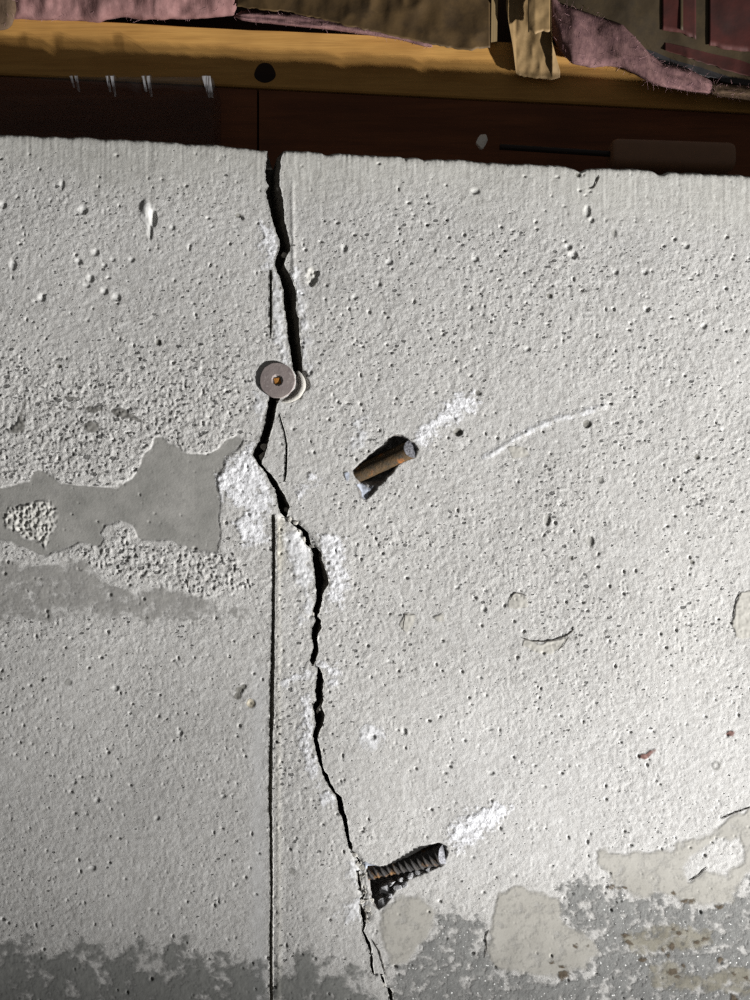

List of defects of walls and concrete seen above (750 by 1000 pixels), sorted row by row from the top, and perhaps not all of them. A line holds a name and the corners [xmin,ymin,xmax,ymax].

peeling [0,437,241,555]
crack [251,151,394,1000]
damp [0,934,377,1000]
peeling [487,887,598,976]
damp [387,866,750,1000]